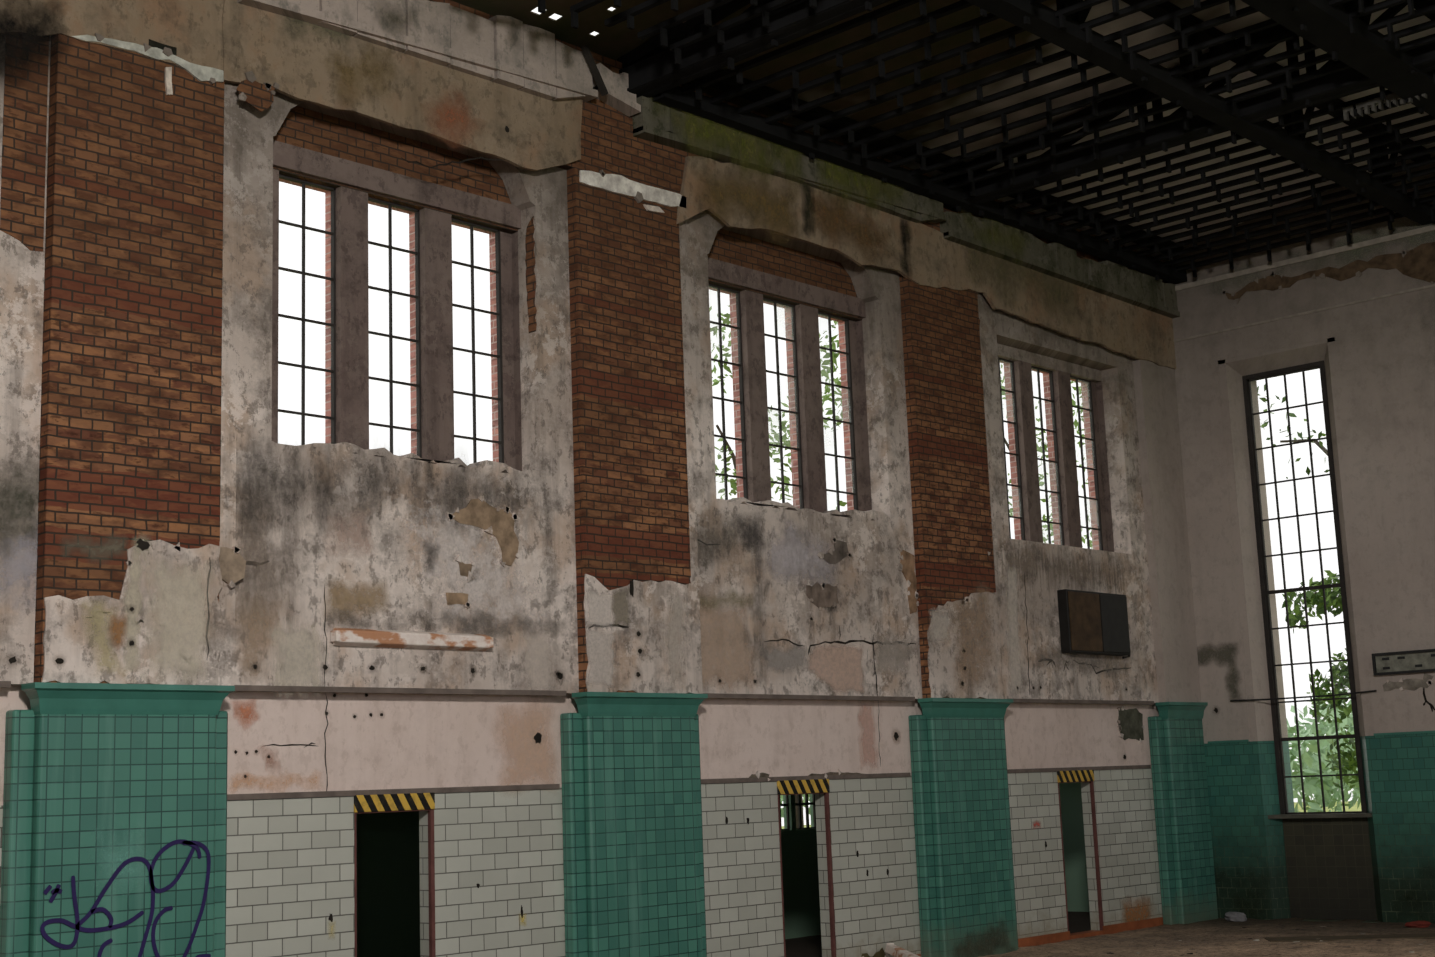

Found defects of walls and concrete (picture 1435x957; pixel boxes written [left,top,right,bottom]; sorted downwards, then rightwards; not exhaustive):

flaking render [0,33,280,611]
damp [706,179,881,249]
damp [901,223,910,272]
peeling [1222,242,1435,304]
flaking render [575,168,693,685]
flaking render [897,285,991,631]
peeling [411,496,545,623]
flaking render [1117,706,1145,759]